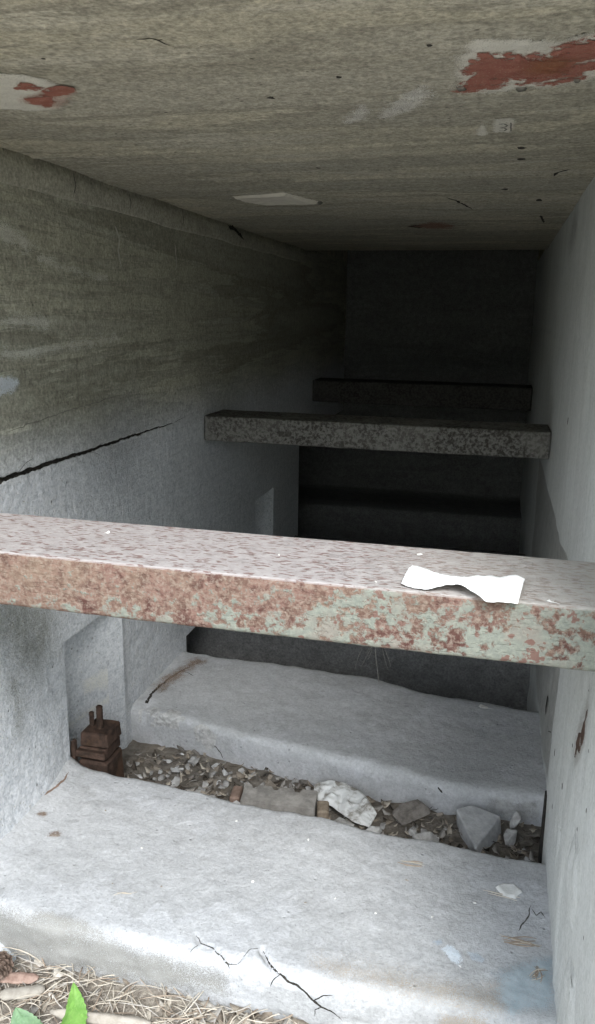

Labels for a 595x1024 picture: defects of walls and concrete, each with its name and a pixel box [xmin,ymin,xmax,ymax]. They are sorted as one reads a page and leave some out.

peeling [0,73,70,112]
peeling [450,32,595,94]
crack [0,418,182,484]
crack [145,656,210,703]
crack [190,936,340,1018]